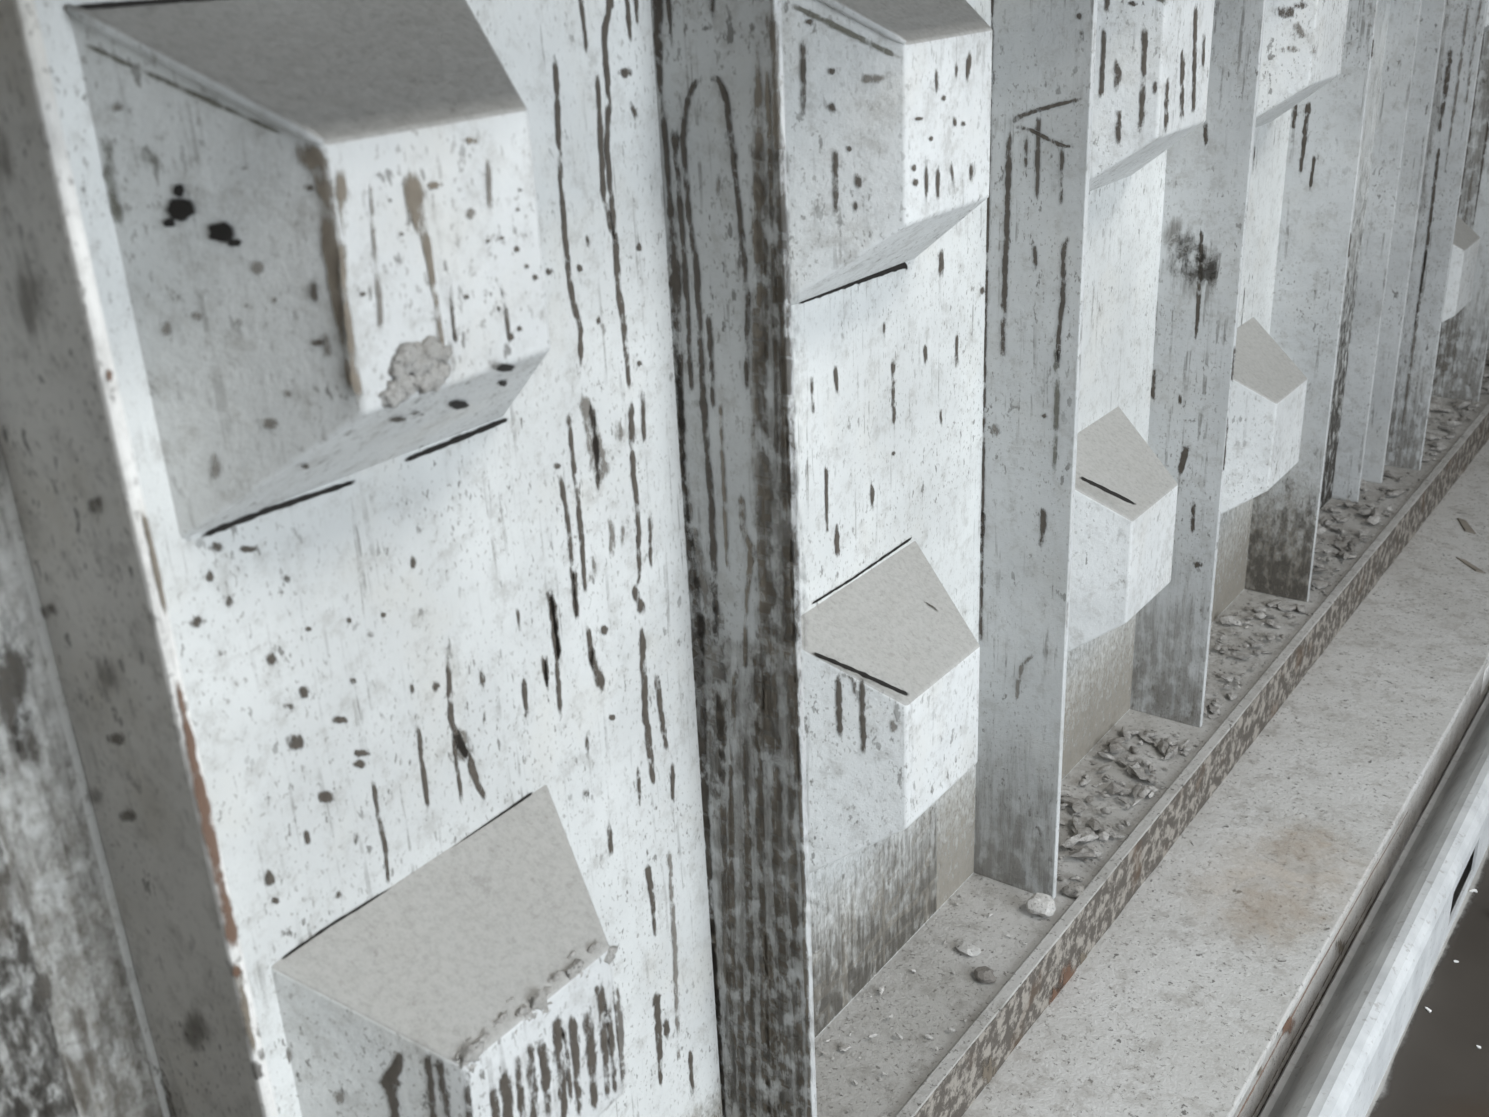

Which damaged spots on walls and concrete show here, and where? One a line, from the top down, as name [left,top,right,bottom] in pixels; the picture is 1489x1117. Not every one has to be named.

water stain [1099,30,1122,97]
water stain [1116,9,1206,143]
water stain [671,76,751,640]
water stain [912,98,1078,639]
water stain [1178,446,1189,474]
water stain [825,467,840,555]
corrosion [143,515,167,611]
corrosion [177,686,238,947]
corrosion [233,965,256,1051]
water stain [380,1053,403,1117]
water stain [425,1055,473,1117]
water stain [490,986,625,1117]